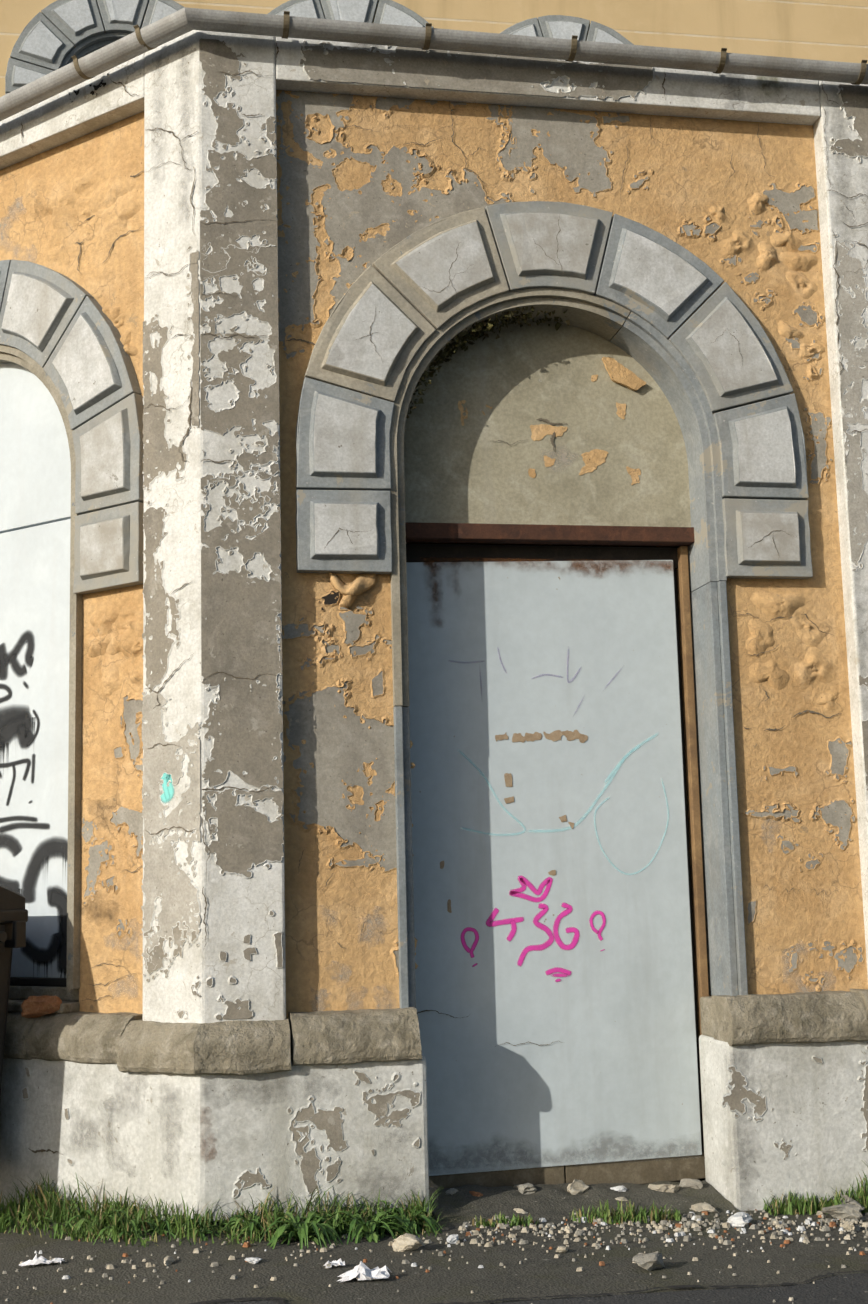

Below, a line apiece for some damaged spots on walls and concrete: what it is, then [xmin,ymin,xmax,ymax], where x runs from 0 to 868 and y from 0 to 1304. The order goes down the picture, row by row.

crack [220,43,279,76]
crack [407,101,487,198]
crack [620,74,666,198]
peeling [829,84,868,164]
crack [76,215,143,272]
crack [130,128,277,296]
crack [170,333,315,345]
peeling [748,182,868,572]
peeling [80,38,655,982]
flaking render [286,1095,349,1197]
flaking render [353,1070,422,1128]
flaking render [721,1064,774,1123]